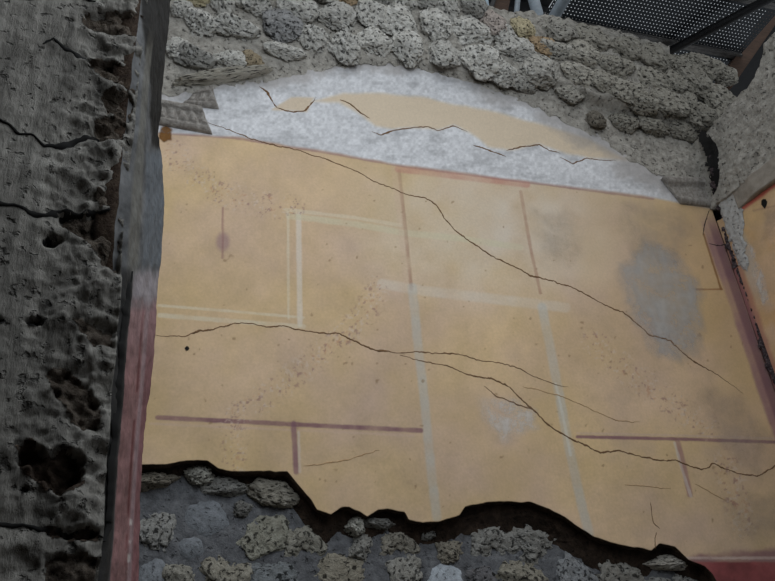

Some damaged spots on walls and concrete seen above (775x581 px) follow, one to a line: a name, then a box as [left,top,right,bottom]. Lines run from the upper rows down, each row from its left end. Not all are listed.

crack [43,37,89,63]
crack [0,118,100,150]
crack [341,100,611,164]
crack [0,201,111,224]
crack [209,123,742,393]
peeling [718,194,749,271]
crack [693,126,775,384]
crack [0,271,133,542]
crack [157,322,775,499]
spalling [138,463,709,581]